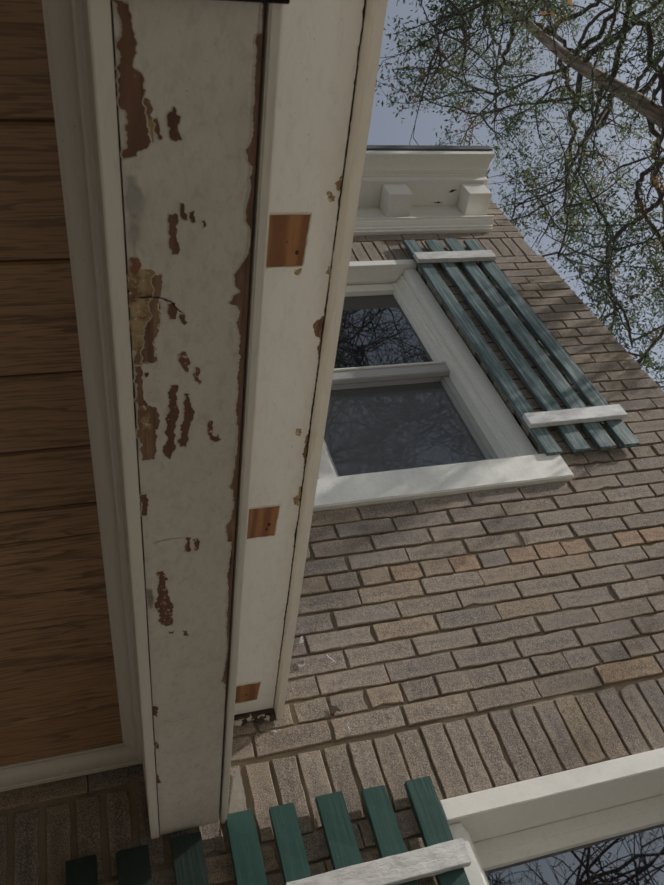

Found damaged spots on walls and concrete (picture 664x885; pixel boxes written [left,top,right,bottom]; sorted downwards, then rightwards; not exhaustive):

peeling [112,0,183,161]
peeling [166,201,208,256]
peeling [266,212,312,275]
peeling [126,257,196,461]
peeling [177,350,203,386]
peeling [220,4,264,704]
peeling [312,315,326,361]
peeling [206,419,222,442]
peeling [295,429,310,464]
peeling [247,504,281,539]
peeling [153,570,190,637]
spalling [234,708,276,727]